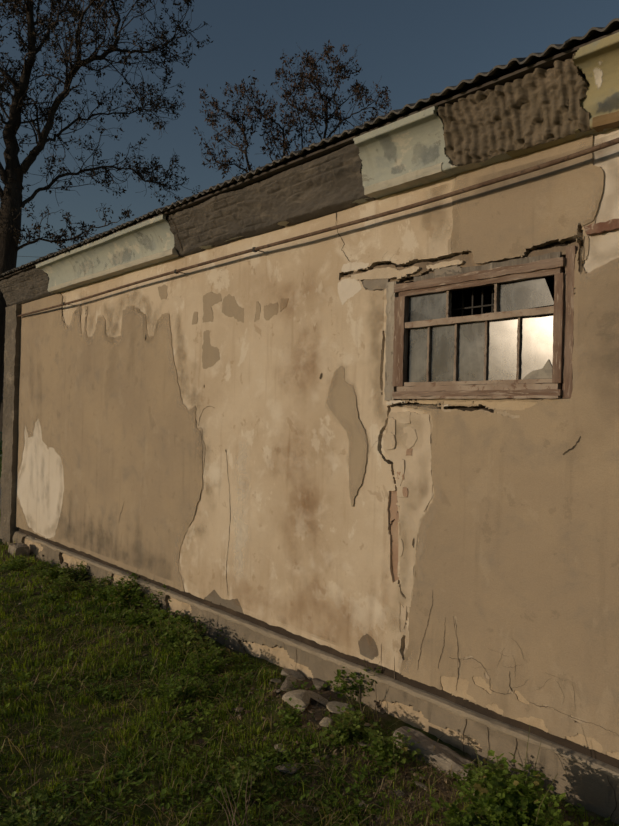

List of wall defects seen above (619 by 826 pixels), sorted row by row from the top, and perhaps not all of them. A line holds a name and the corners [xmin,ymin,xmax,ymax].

peeling [528,127,619,274]
peeling [16,419,64,556]
peeling [61,175,537,680]
spalling [380,700,482,755]
spalling [440,676,503,715]
crack [417,591,619,736]
spalling [515,716,548,732]
spalling [566,734,619,760]